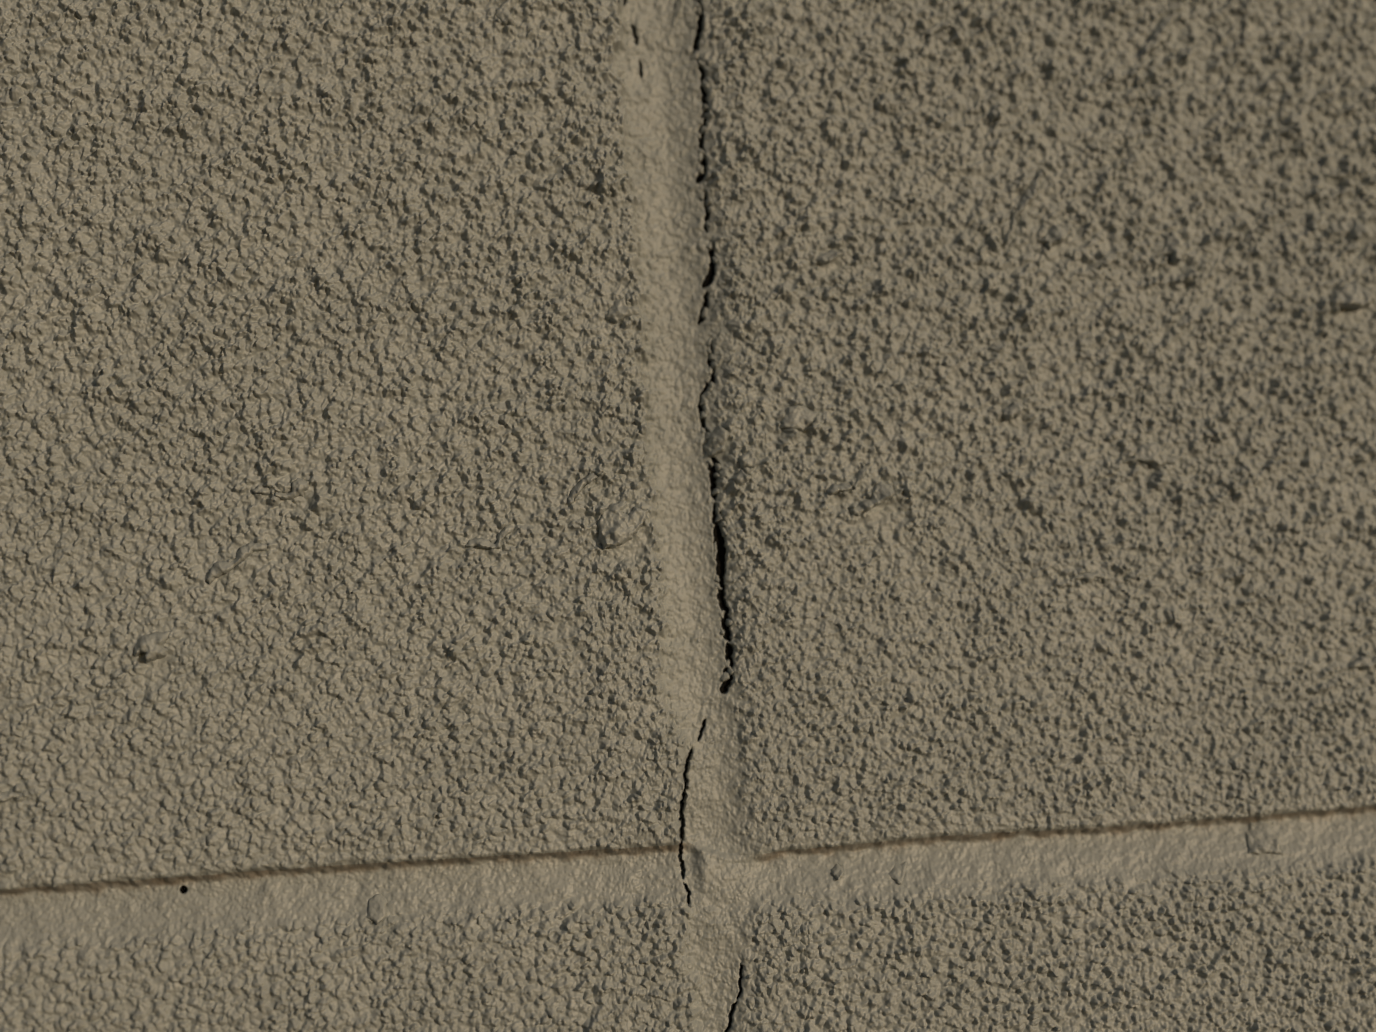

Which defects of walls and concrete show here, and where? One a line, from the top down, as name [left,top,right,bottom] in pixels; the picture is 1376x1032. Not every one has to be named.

crack [679,0,734,904]
crack [725,964,742,1032]